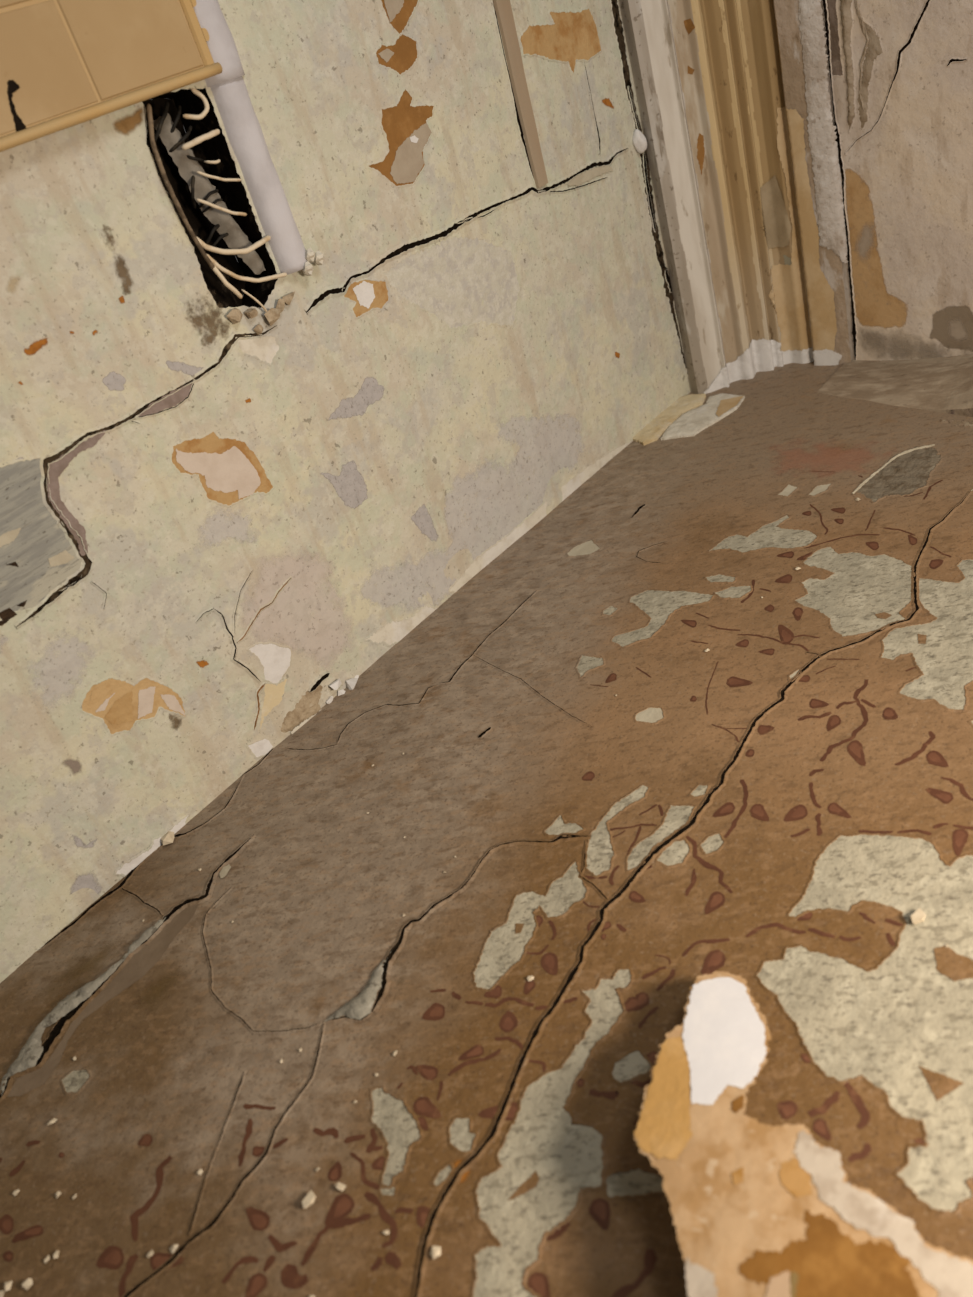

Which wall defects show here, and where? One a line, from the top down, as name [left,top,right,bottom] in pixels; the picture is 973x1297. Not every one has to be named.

peeling [366,0,435,189]
crack [304,0,688,377]
crack [821,0,932,360]
peeling [0,600,27,626]
peeling [79,675,187,737]
crack [14,323,278,630]
peeling [169,429,275,508]
peeling [59,1067,93,1096]
crack [0,491,973,1297]
peeling [753,833,973,1217]